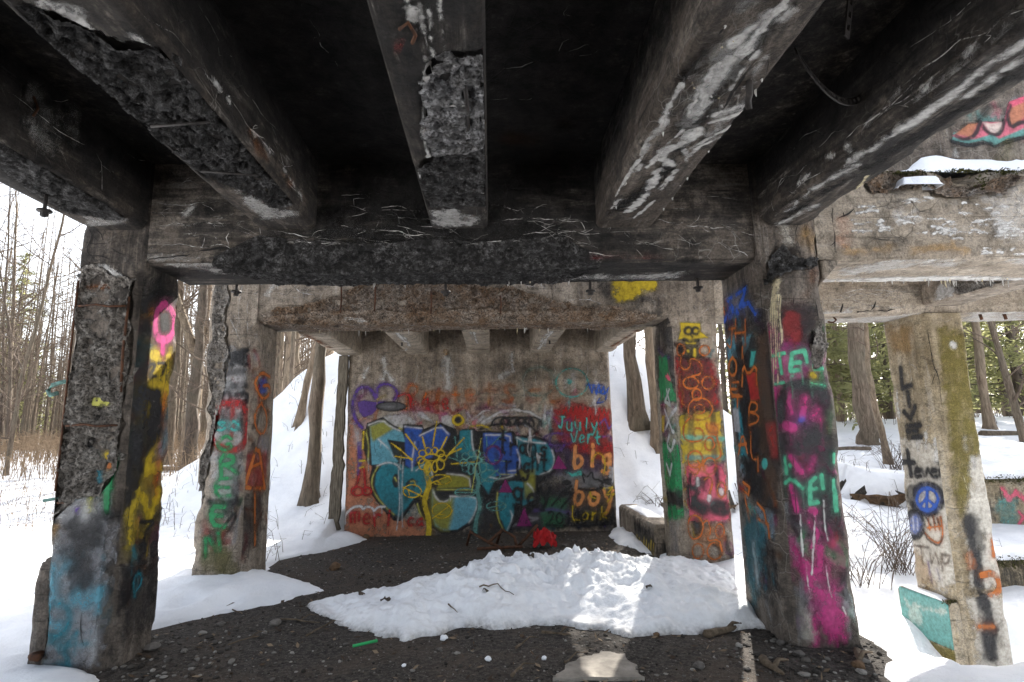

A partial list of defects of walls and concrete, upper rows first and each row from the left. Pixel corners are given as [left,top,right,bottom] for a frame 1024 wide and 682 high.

spalling [0,143,125,221]
spalling [15,4,293,209]
spalling [418,51,487,210]
leakage [607,0,793,218]
leakage [779,180,845,224]
leakage [847,40,1024,163]
spalling [866,171,1024,197]
spalling [198,235,657,505]
spalling [43,264,139,668]